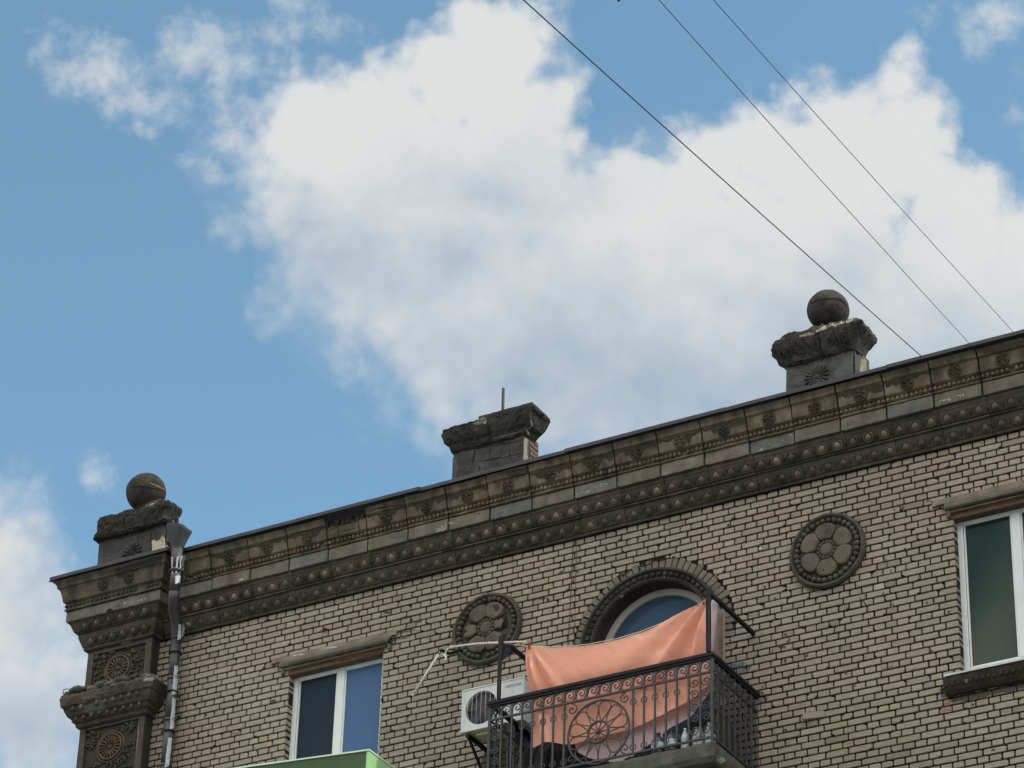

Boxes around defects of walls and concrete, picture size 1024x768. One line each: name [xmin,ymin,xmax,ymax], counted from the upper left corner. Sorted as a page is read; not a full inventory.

flaking render [529,439,539,459]
peeling [152,534,186,584]